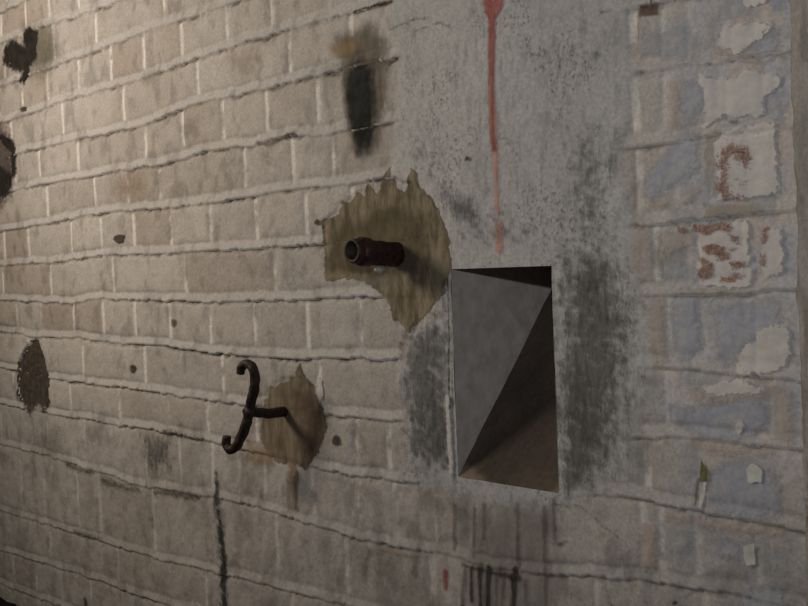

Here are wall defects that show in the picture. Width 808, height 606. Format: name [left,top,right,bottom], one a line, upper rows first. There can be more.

peeling [247,363,327,508]
peeling [321,167,451,333]
damp [400,306,452,467]
damp [553,232,631,489]
peeling [637,0,794,572]
damp [461,503,525,606]